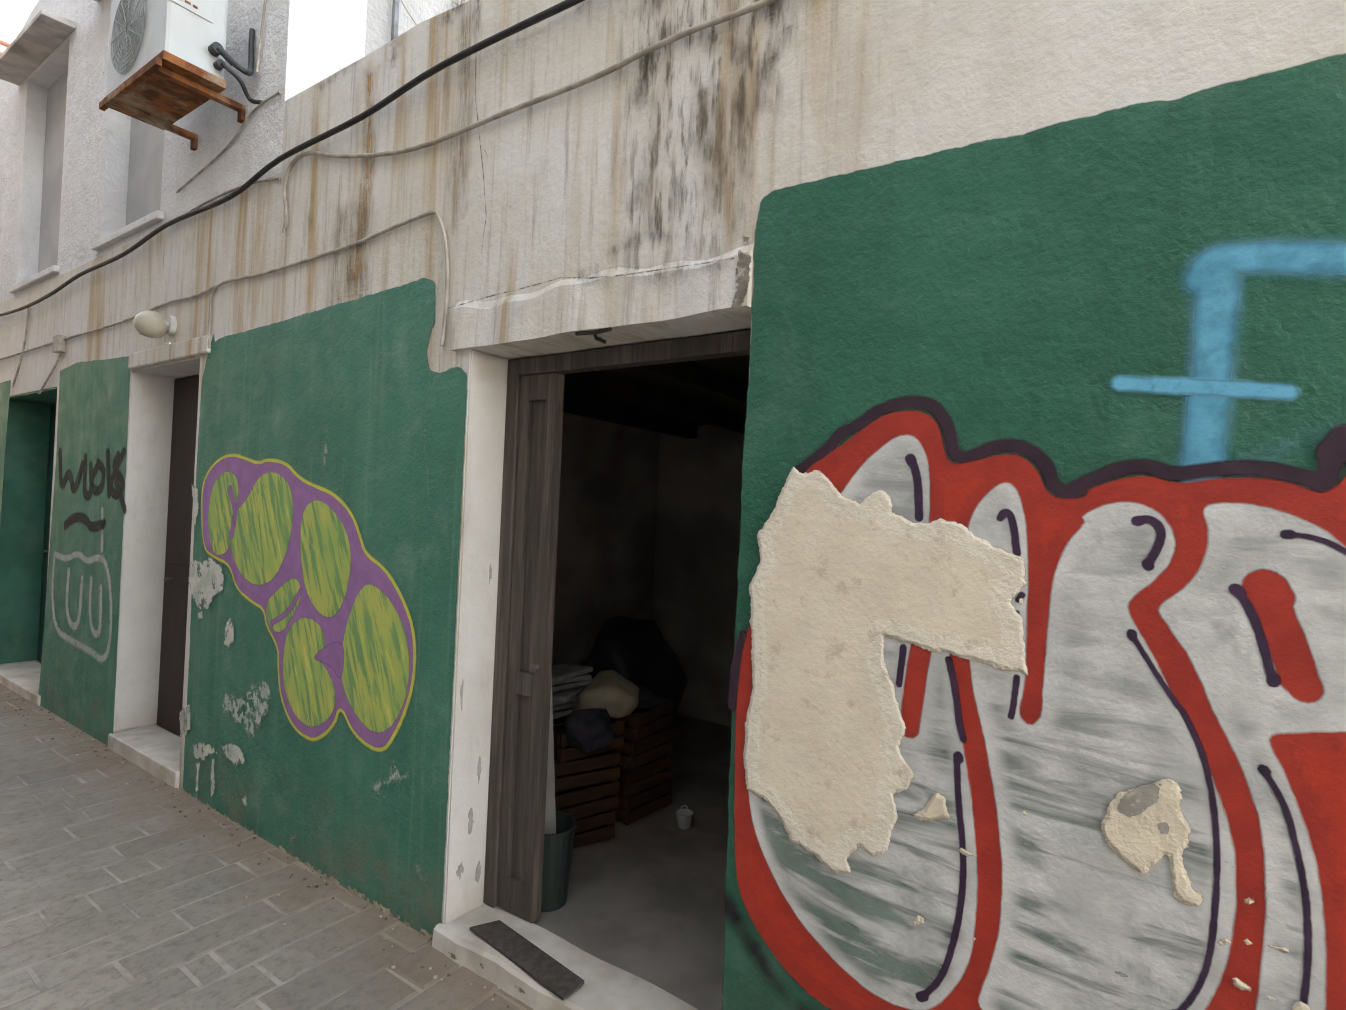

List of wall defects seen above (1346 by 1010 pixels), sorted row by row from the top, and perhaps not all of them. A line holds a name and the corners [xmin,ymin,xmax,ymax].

leakage [636,0,782,237]
peeling [188,558,224,619]
peeling [224,619,234,647]
peeling [743,467,1028,874]
peeling [1101,778,1203,907]